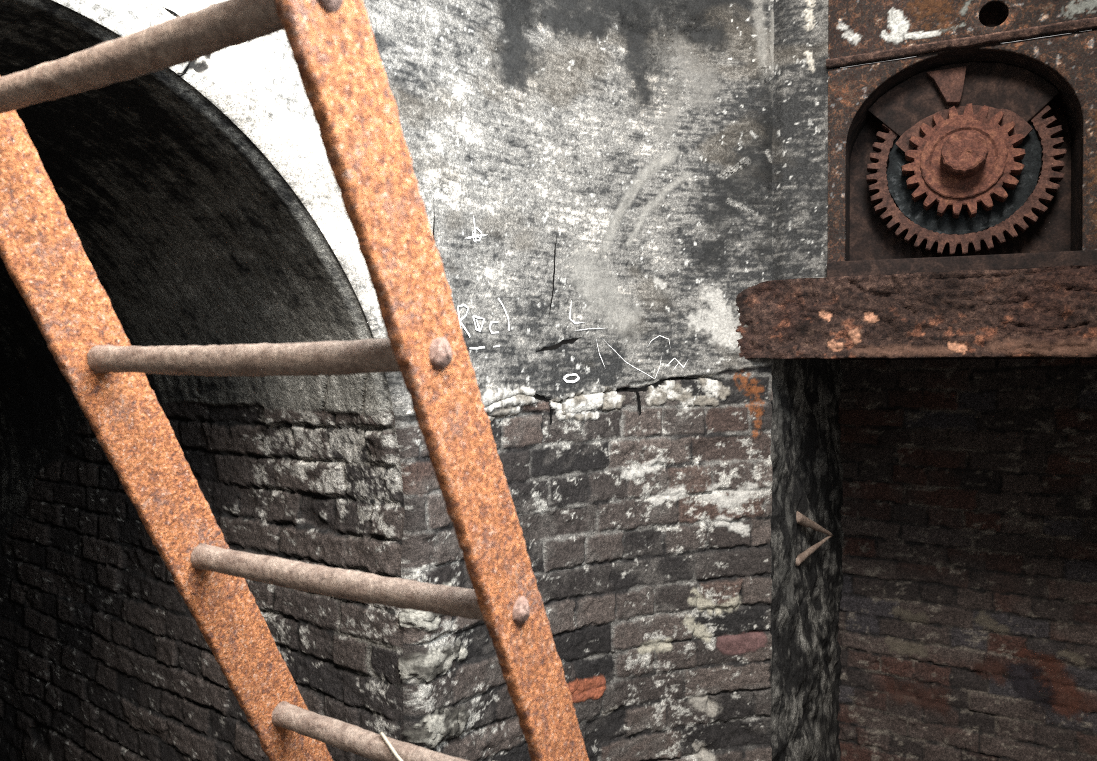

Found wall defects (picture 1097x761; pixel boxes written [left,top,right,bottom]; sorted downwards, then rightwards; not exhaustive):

damp [499,0,535,90]
damp [618,5,727,107]
crack [533,377,720,425]
rust [734,373,763,436]
efflorescence [621,458,665,479]
efflorescence [650,485,686,505]
efflorescence [703,483,758,536]
efflorescence [684,589,740,642]
efflorescence [638,638,672,654]
efflorescence [690,695,717,717]
efflorescence [693,743,715,761]